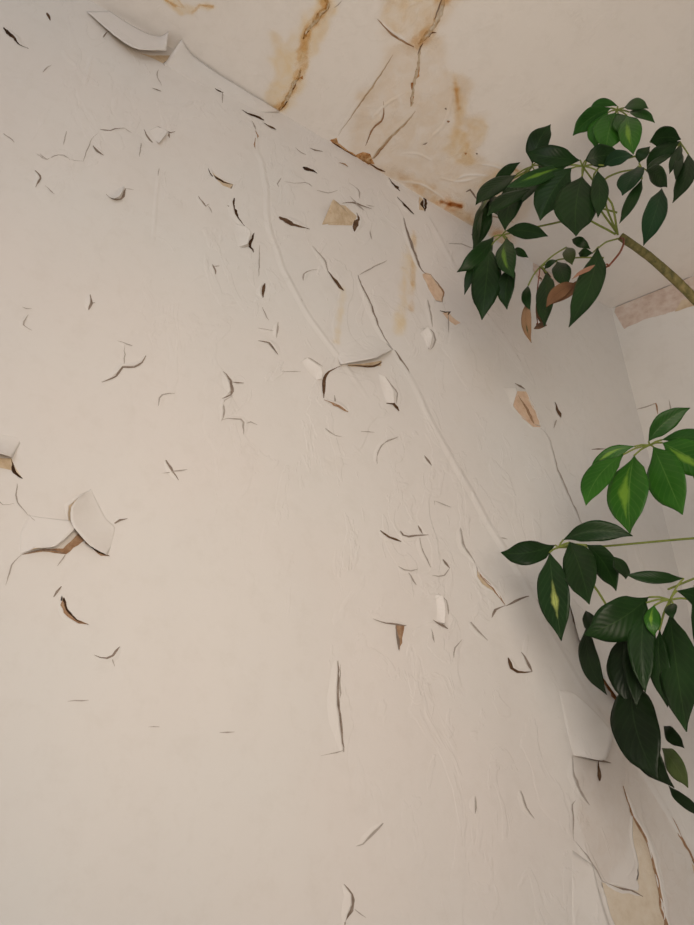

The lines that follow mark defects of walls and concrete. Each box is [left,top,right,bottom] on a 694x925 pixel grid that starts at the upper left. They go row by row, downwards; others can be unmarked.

peeling [87,11,279,112]
damp [278,0,341,111]
damp [364,0,445,159]
flaking render [329,137,385,172]
peeling [322,200,374,232]
peeling [401,218,462,349]
peeling [282,336,399,411]
peeling [0,435,128,583]
peeling [53,586,89,626]
peeling [373,618,406,650]
peeling [570,596,618,699]
peeling [559,690,672,925]